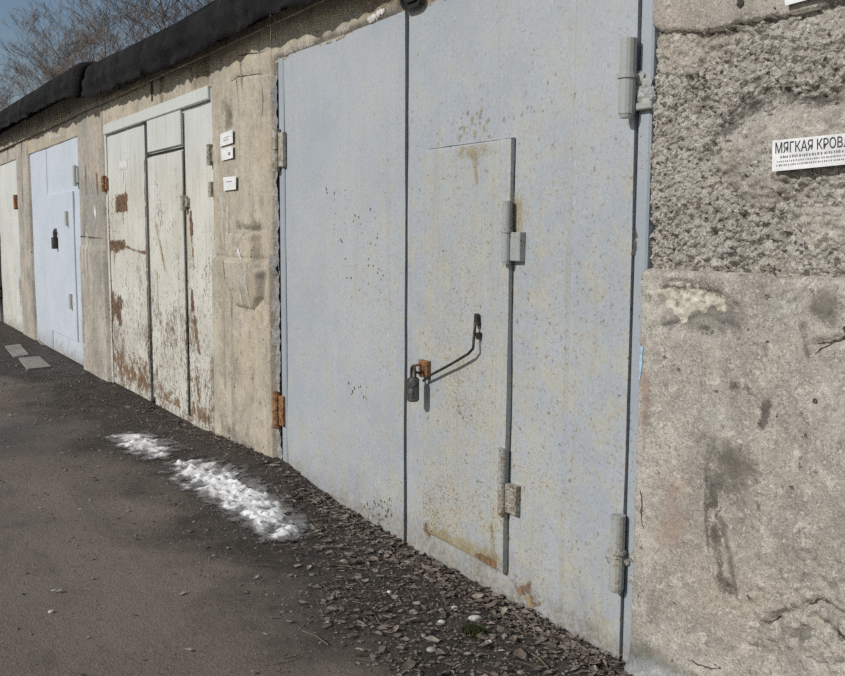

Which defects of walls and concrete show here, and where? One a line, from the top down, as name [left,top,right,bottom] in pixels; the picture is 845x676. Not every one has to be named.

crack [232,51,266,114]
spalling [649,0,845,278]
damp [707,90,845,155]
peeling [115,192,127,213]
peeling [112,290,124,327]
corrosion [110,211,165,349]
spalling [656,281,739,332]
crack [815,336,845,354]
corrosion [424,522,498,569]
damp [704,444,750,594]
corrosion [511,580,541,608]
crack [769,594,845,663]